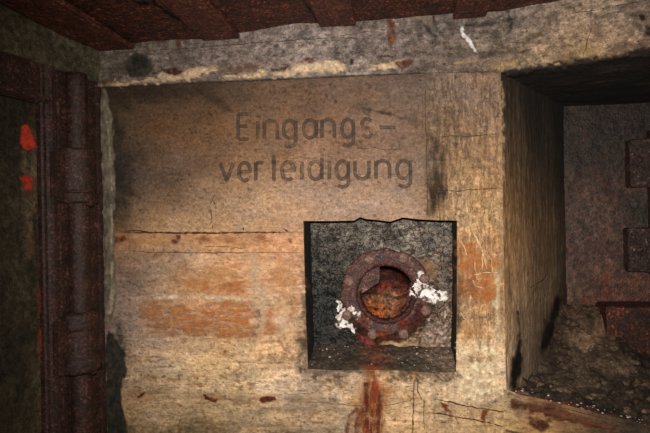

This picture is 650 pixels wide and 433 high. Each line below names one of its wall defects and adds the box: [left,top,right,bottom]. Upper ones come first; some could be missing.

water stain [126,53,152,77]
spalling [101,58,353,86]
spalling [368,55,410,70]
water stain [429,170,445,210]
corrosion [351,303,429,347]
corrosion [346,379,386,433]